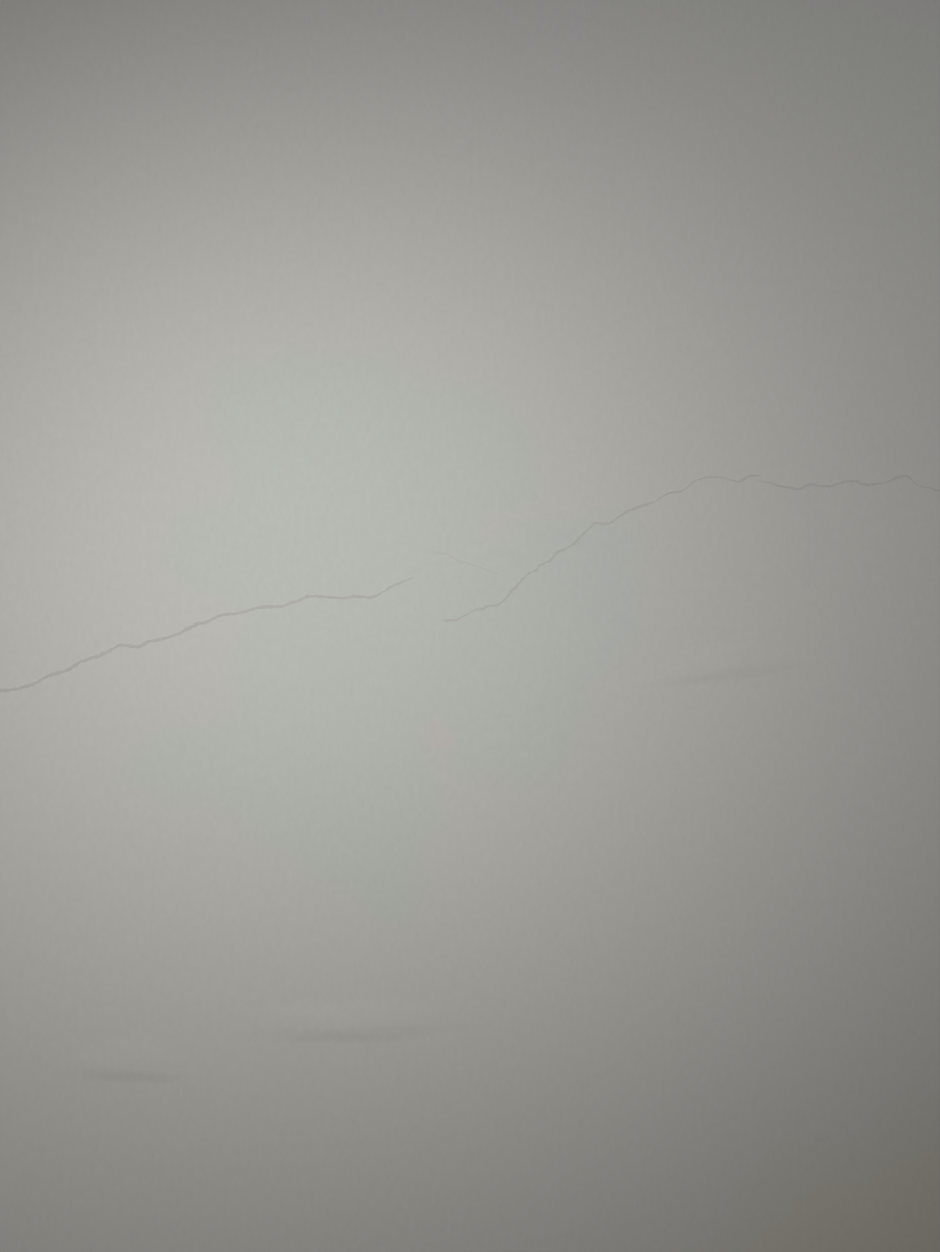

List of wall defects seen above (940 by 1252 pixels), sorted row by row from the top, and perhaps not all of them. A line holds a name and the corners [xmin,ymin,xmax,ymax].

crack [443,474,940,622]
crack [0,577,413,692]